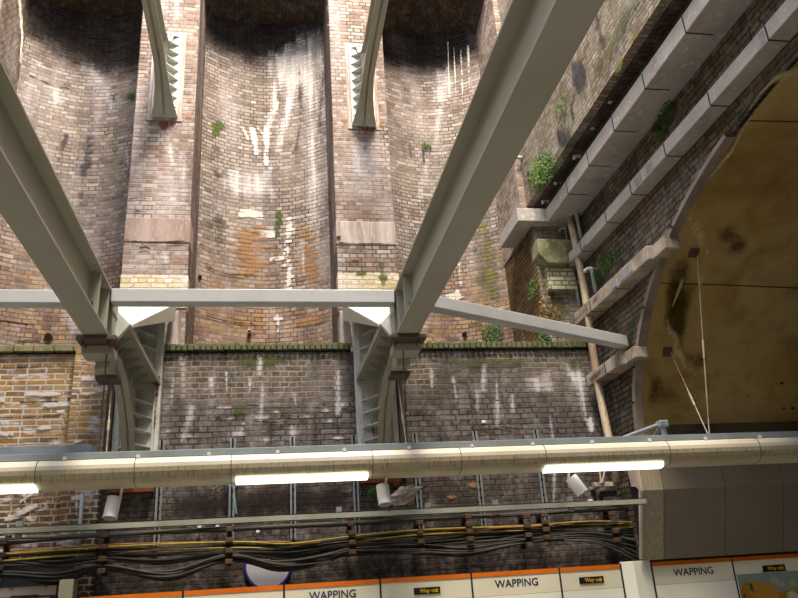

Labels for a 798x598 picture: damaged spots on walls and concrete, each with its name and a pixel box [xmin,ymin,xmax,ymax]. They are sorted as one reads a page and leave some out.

damp [570,60,586,120]
damp [80,135,93,177]
damp [215,170,272,195]
damp [237,38,324,289]
damp [557,128,570,147]
damp [666,262,703,371]
damp [567,365,600,432]